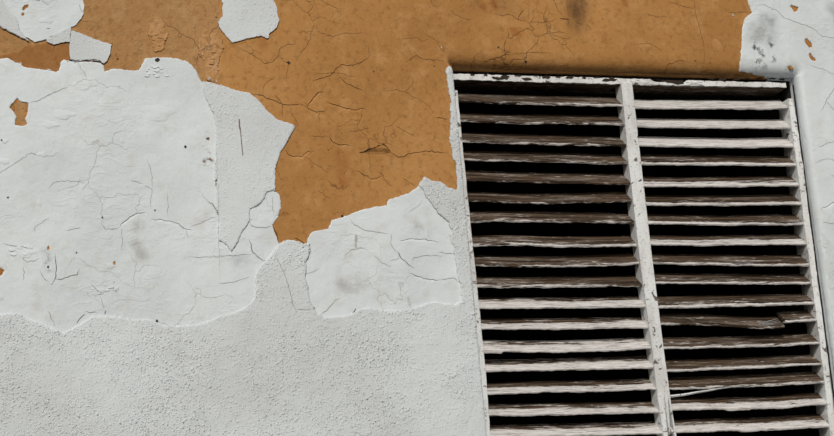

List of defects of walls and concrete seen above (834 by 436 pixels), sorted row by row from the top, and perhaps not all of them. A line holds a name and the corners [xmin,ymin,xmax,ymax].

crack [237,31,369,195]
peeling [0,0,768,243]
crack [6,218,114,323]
crack [101,160,356,314]
crack [348,218,456,283]
crack [792,85,834,400]